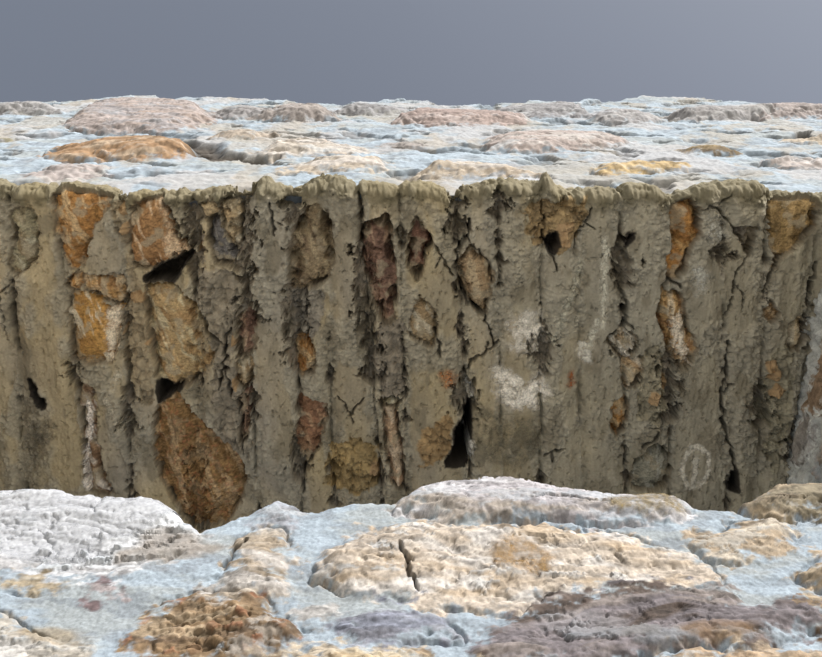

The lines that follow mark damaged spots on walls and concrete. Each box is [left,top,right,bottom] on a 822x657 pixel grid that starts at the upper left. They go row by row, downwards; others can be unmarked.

spalling [4,182,260,529]
spalling [285,202,337,379]
crack [337,395,365,425]
spalling [292,212,456,497]
crack [432,326,442,359]
crack [434,217,500,373]
crack [603,266,635,343]
spalling [626,442,675,494]
spalling [604,195,705,439]
crack [692,197,733,229]
crack [718,255,748,476]
spalling [732,191,822,271]